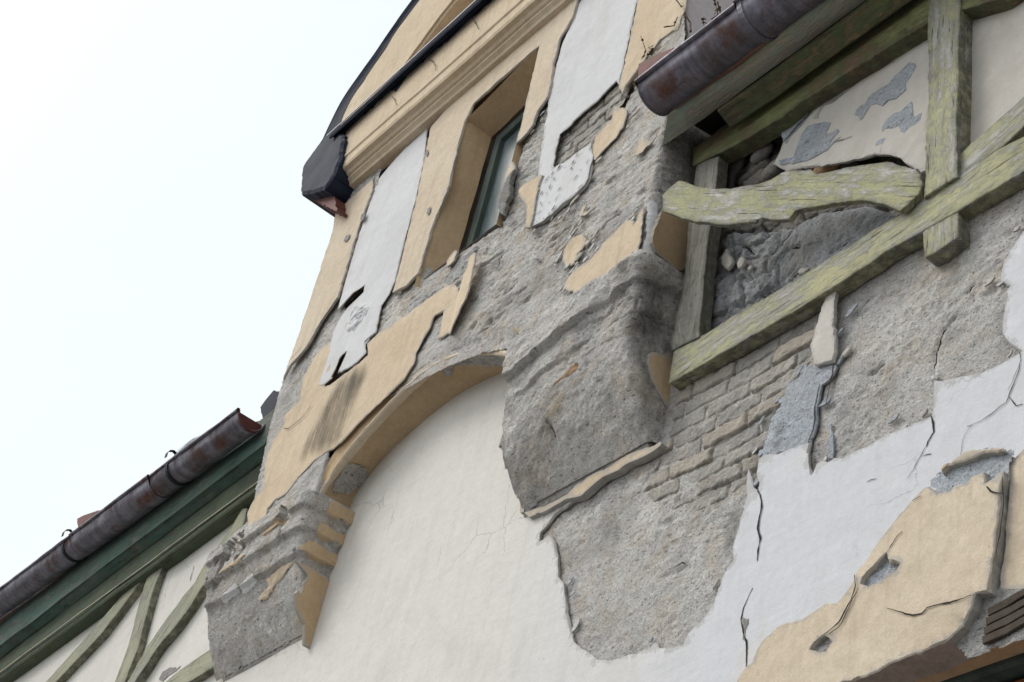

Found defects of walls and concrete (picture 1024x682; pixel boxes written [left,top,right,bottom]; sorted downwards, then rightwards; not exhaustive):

peeling [855,62,922,146]
leakage [306,372,362,447]
spalling [366,82,1024,660]
crack [961,352,1022,451]
crack [908,415,934,501]
crack [755,490,763,560]
crack [986,477,1004,554]
spalling [203,452,368,681]
crack [740,588,753,666]
crack [814,575,859,643]
crack [887,594,974,616]